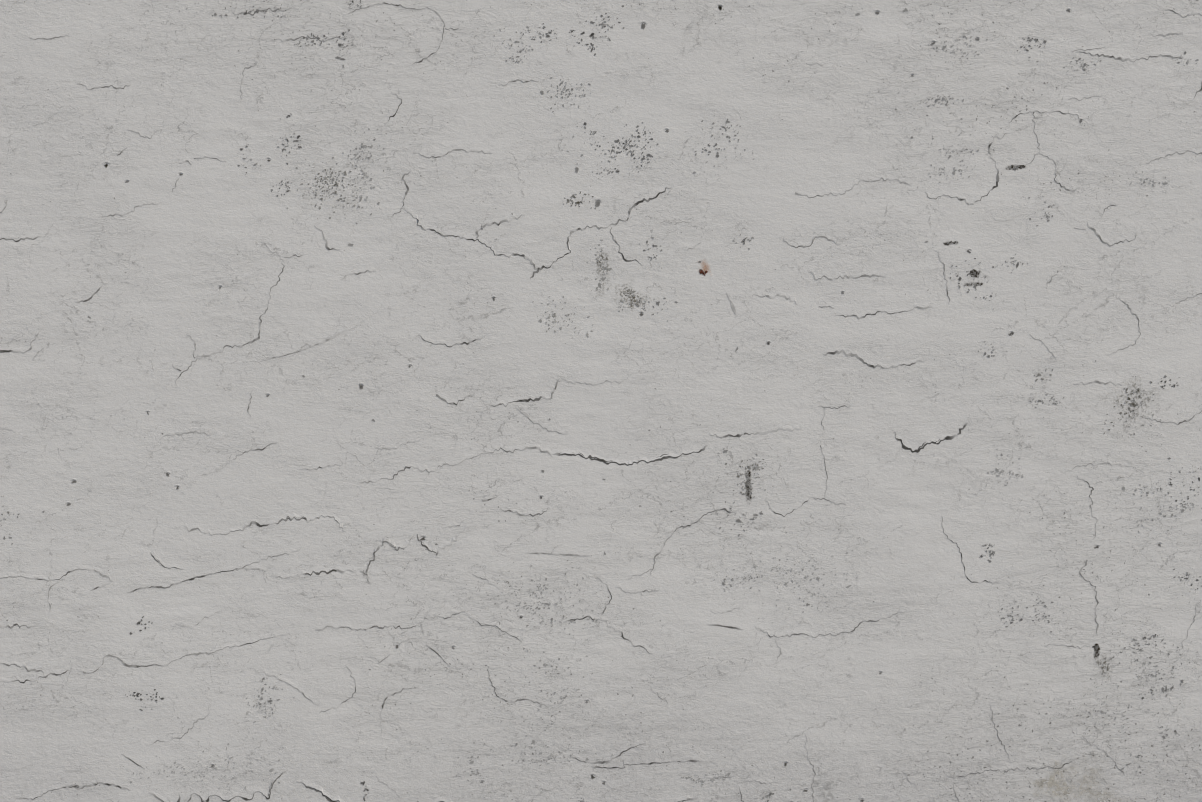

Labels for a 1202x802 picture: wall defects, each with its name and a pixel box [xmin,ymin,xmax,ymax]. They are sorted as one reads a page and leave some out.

crack [391,145,672,279]
crack [0,326,43,353]
crack [162,390,277,476]
crack [299,375,851,517]
crack [894,423,968,453]
crack [184,490,550,585]
crack [563,505,737,654]
crack [0,621,37,629]
crack [0,660,73,683]